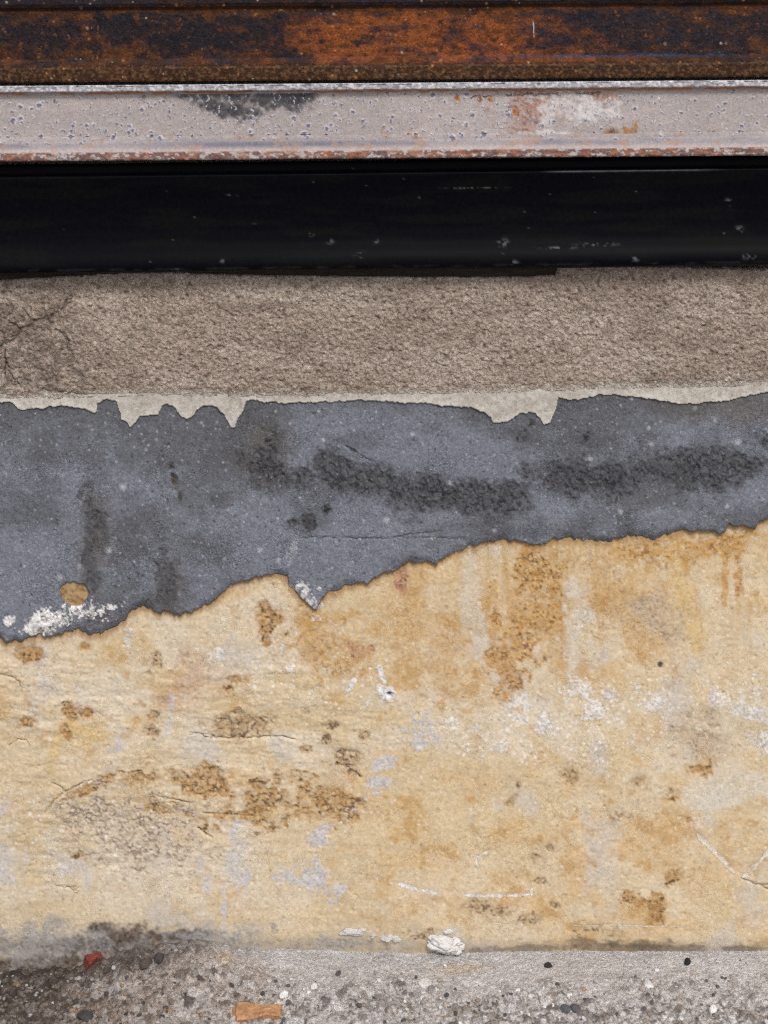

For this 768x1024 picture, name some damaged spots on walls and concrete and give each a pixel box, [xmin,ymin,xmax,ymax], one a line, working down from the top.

crack [0,296,156,397]
spalling [117,403,768,539]
efflorescence [2,599,118,637]
spalling [75,466,113,605]
spalling [130,537,183,612]
spalling [252,582,290,649]
damp [454,544,490,665]
damp [548,556,620,726]
spalling [58,697,96,745]
spalling [656,700,747,781]
spalling [25,706,379,887]
spalling [453,893,562,929]